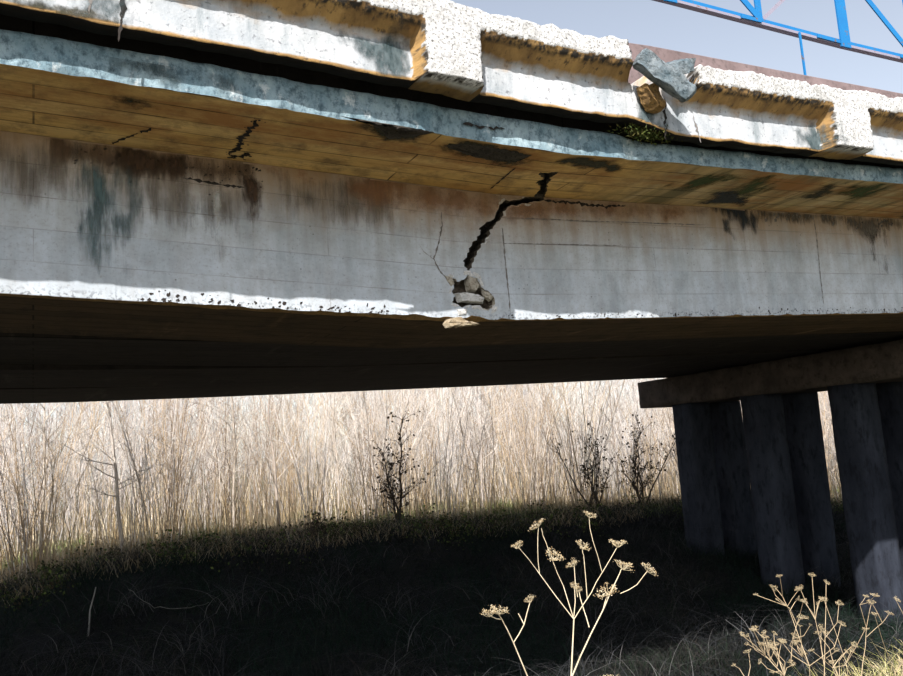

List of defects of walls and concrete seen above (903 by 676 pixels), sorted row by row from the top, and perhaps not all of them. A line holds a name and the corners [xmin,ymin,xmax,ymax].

crack [118,0,127,42]
damp [354,36,410,77]
spalling [633,48,697,114]
crack [112,128,151,144]
crack [226,118,266,160]
damp [12,138,252,258]
crack [184,177,244,188]
rust [243,177,261,215]
crack [419,168,695,314]
damp [848,216,903,259]
spalling [443,270,498,328]